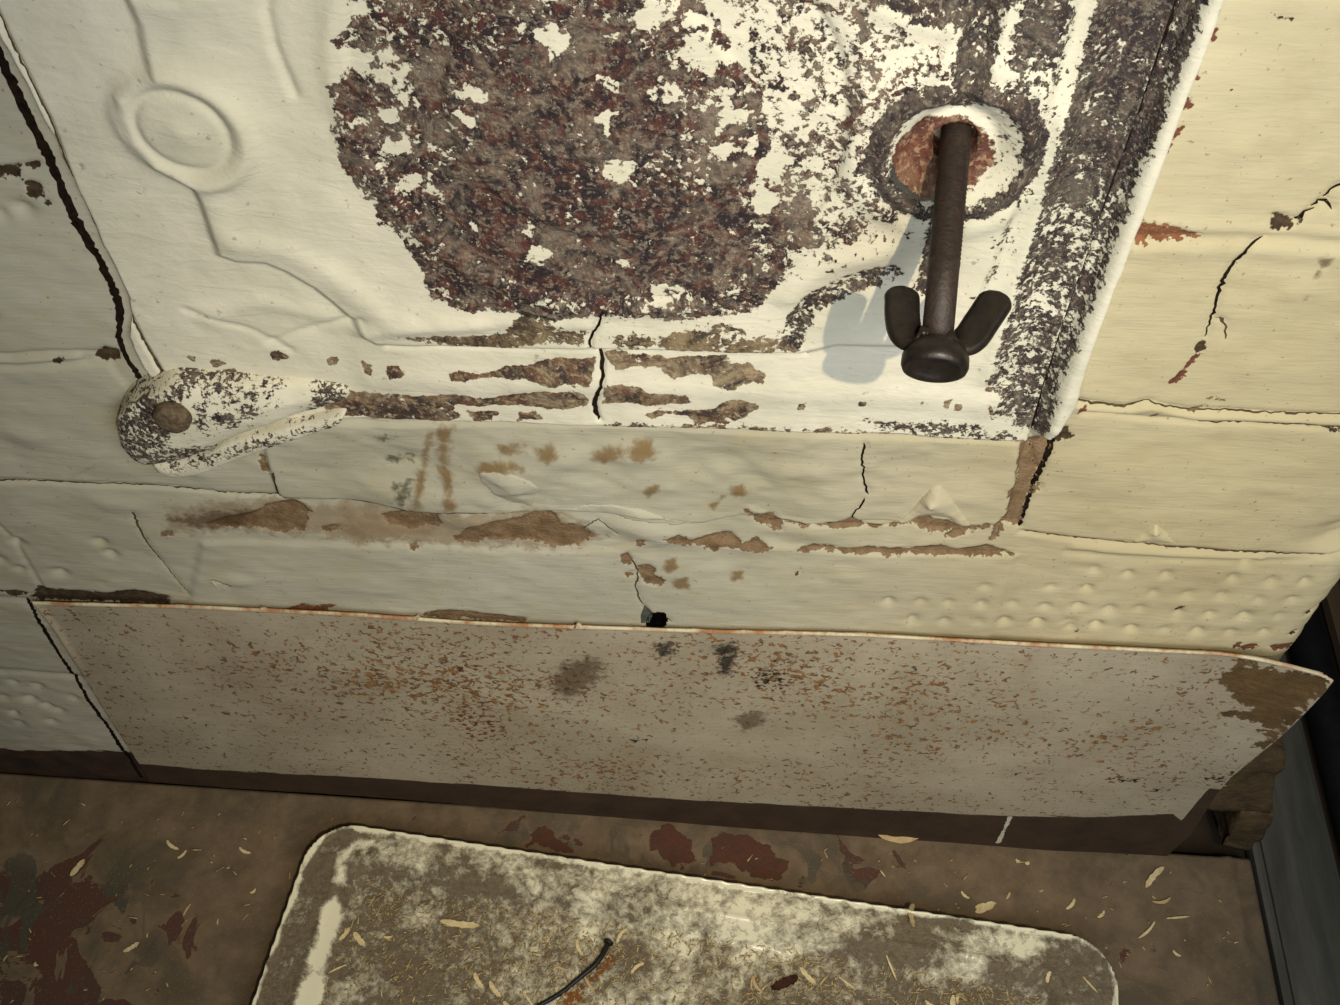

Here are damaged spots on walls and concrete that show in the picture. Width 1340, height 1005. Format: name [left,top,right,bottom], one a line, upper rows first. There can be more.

rust [892,115,996,198]
crack [1294,183,1340,219]
peeling [117,0,1219,576]
crack [1205,236,1263,339]
crack [588,310,605,420]
crack [852,443,869,517]
spalling [620,540,666,587]
leakage [717,654,738,675]